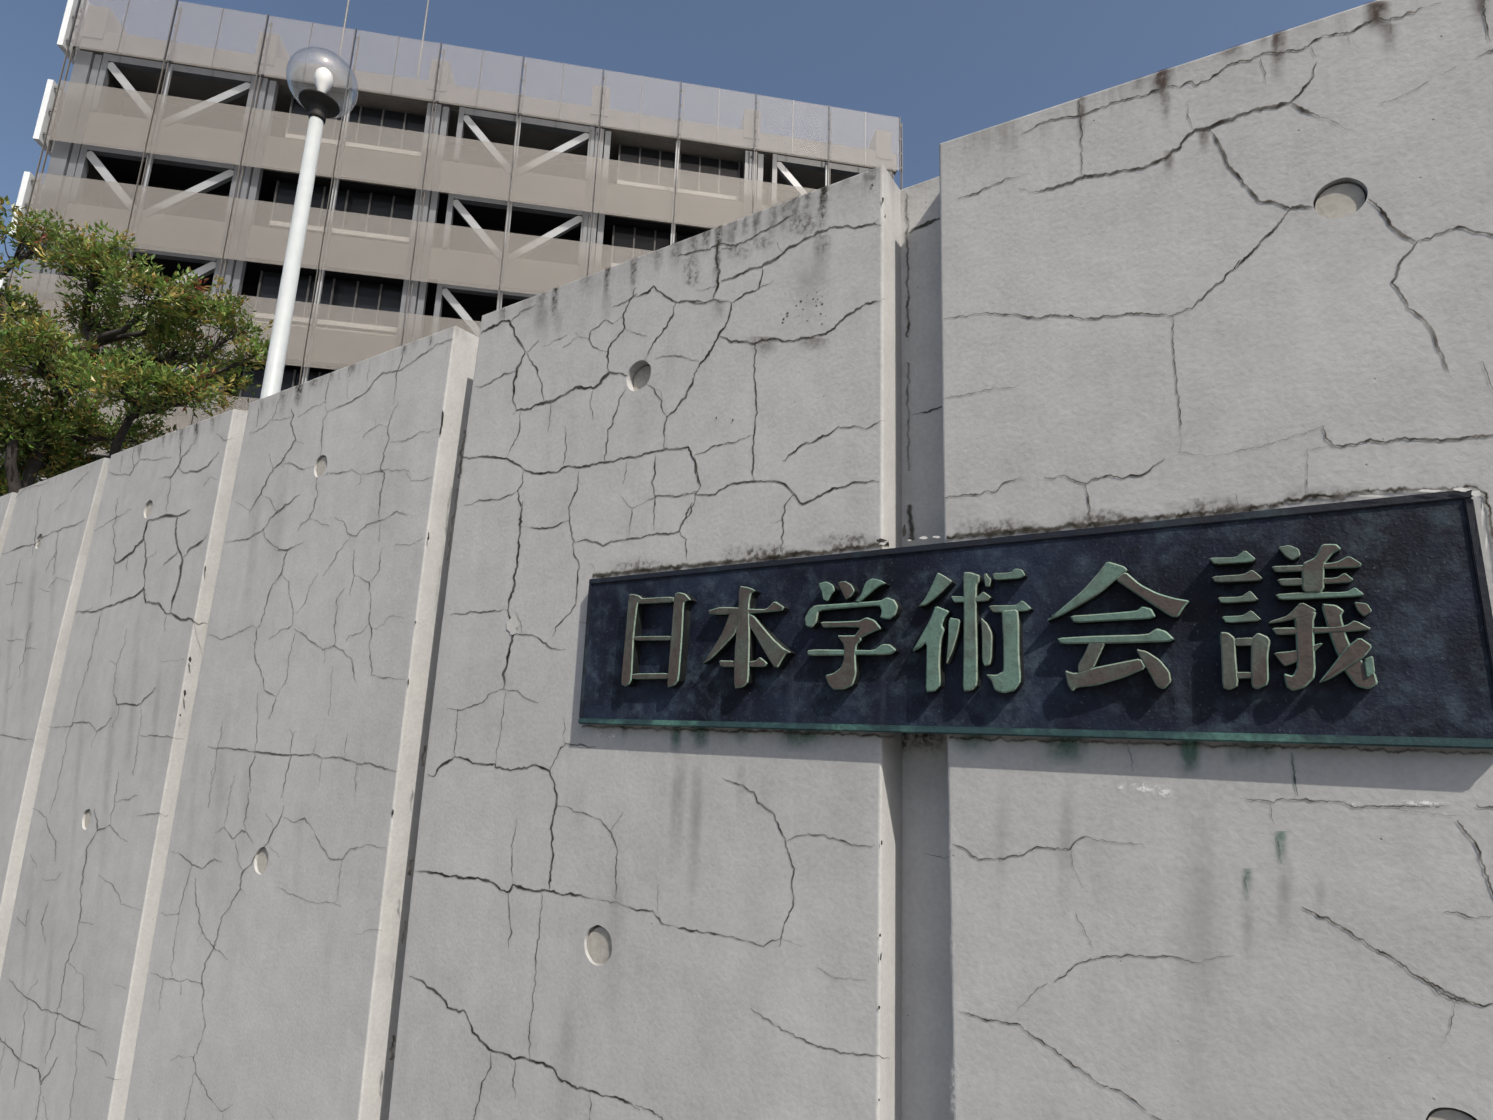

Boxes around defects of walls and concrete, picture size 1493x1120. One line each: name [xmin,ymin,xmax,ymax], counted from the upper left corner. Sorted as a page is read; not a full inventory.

crack [908,0,1493,522]
crack [0,215,885,1120]
crack [931,836,1227,1120]
water stain [1182,741,1197,766]
crack [1247,753,1493,918]
crack [1302,907,1493,1034]